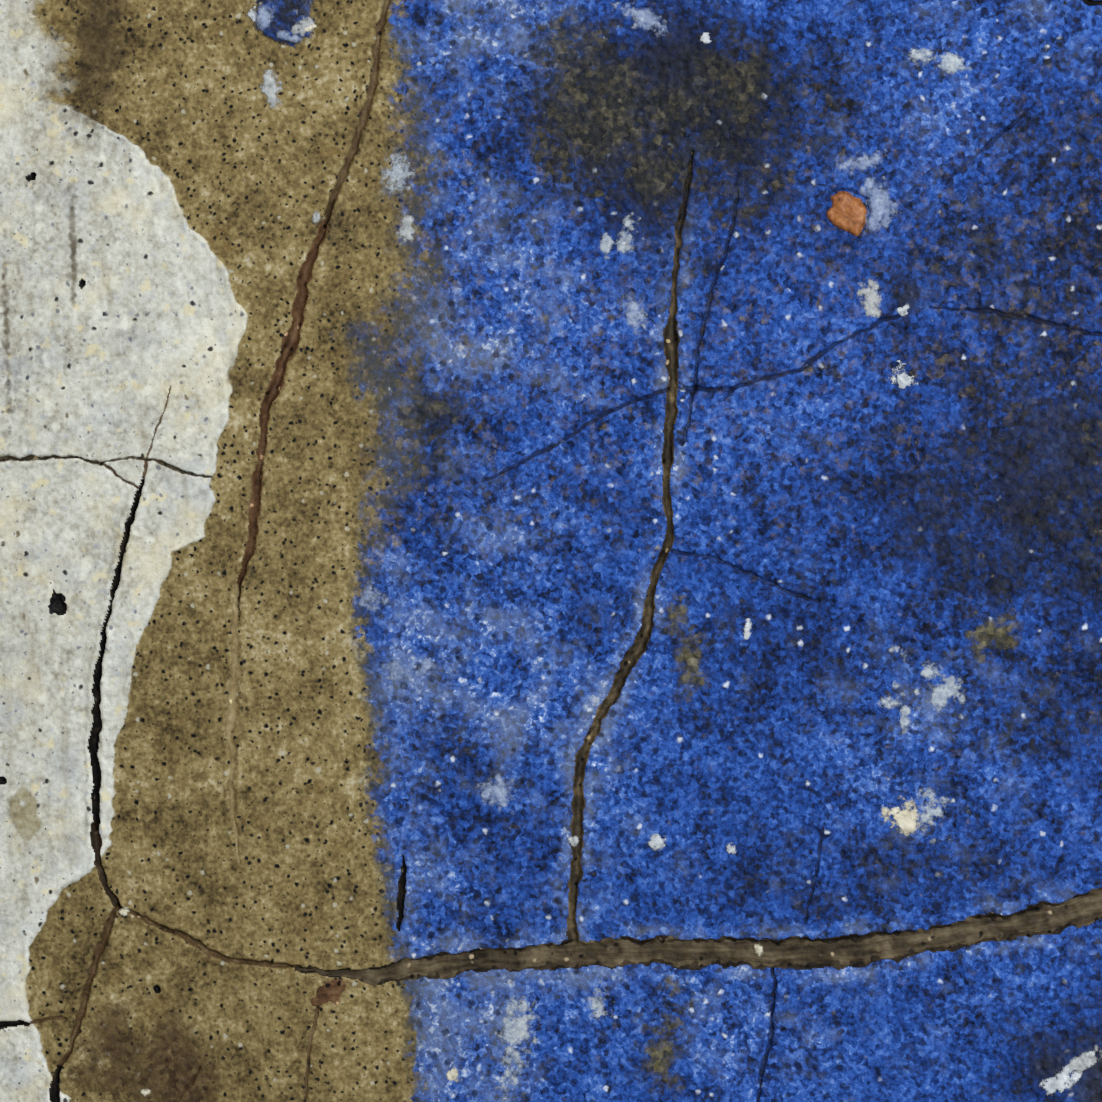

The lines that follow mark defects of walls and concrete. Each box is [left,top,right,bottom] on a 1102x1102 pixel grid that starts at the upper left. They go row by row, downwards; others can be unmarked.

peeling [247,0,316,46]
crack [1082,0,1102,8]
peeling [260,70,282,107]
damp [593,21,722,221]
crack [226,0,390,863]
spalling [48,589,67,615]
crack [129,150,1102,1102]
crack [0,386,212,1102]
damp [1031,1032,1102,1102]